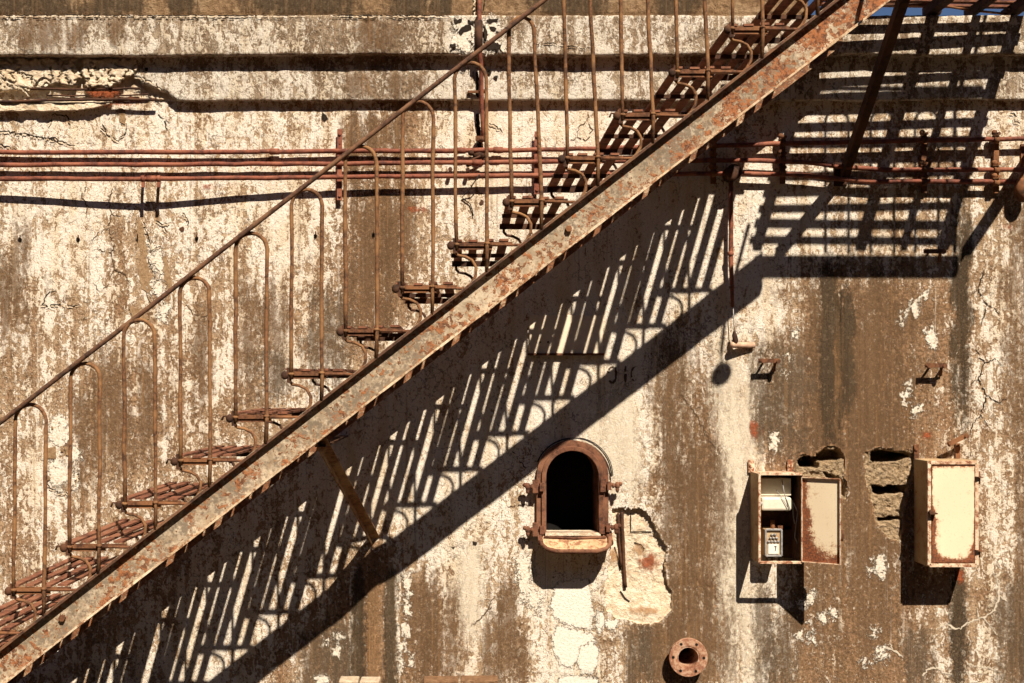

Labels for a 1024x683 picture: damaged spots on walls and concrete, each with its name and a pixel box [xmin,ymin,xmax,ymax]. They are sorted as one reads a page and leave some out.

spalling [0,58,174,124]
peeling [450,12,506,97]
crack [970,271,1000,325]
damp [579,188,1024,683]
spalling [796,446,848,500]
spalling [864,447,914,542]
crack [969,349,1004,436]
spalling [511,506,672,683]